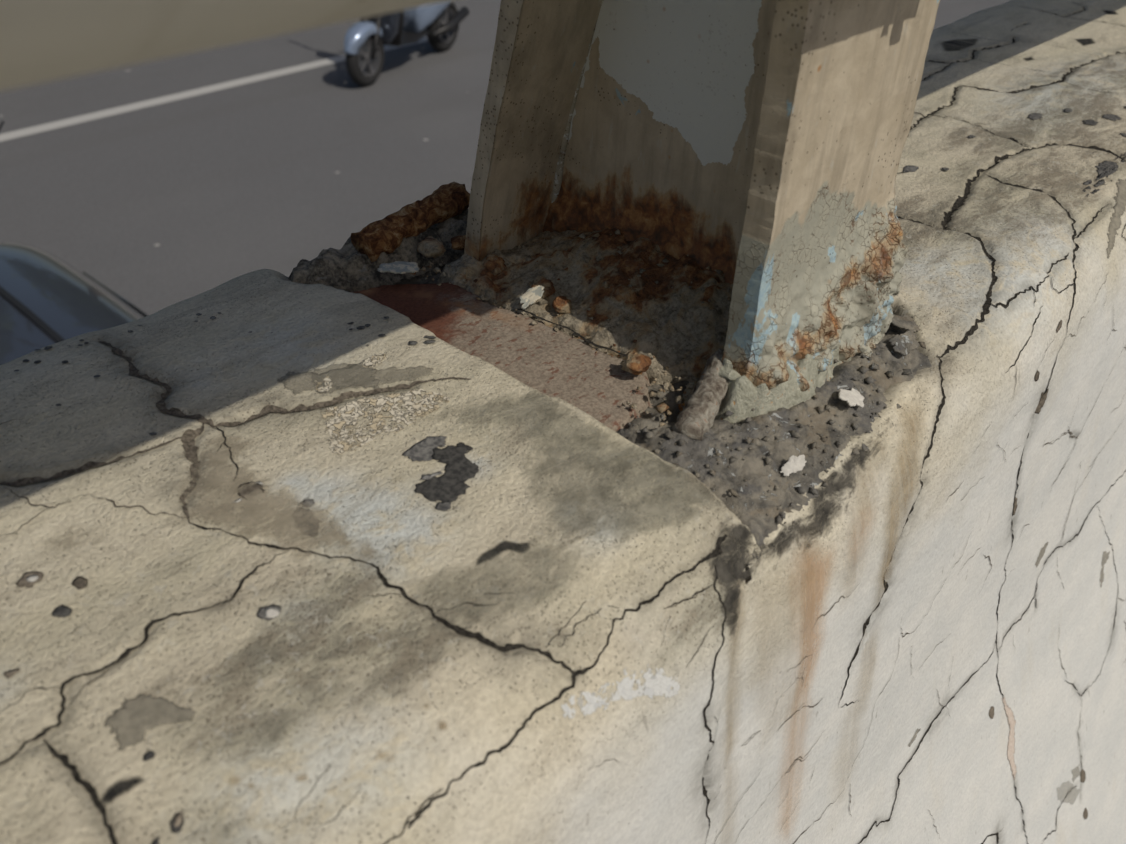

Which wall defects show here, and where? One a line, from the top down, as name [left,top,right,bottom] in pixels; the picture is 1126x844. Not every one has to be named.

crack [0,341,852,844]
crack [518,309,626,356]
spalling [288,209,932,565]
corrosion [437,227,851,441]
leakage [711,442,875,634]
crack [742,3,1126,844]